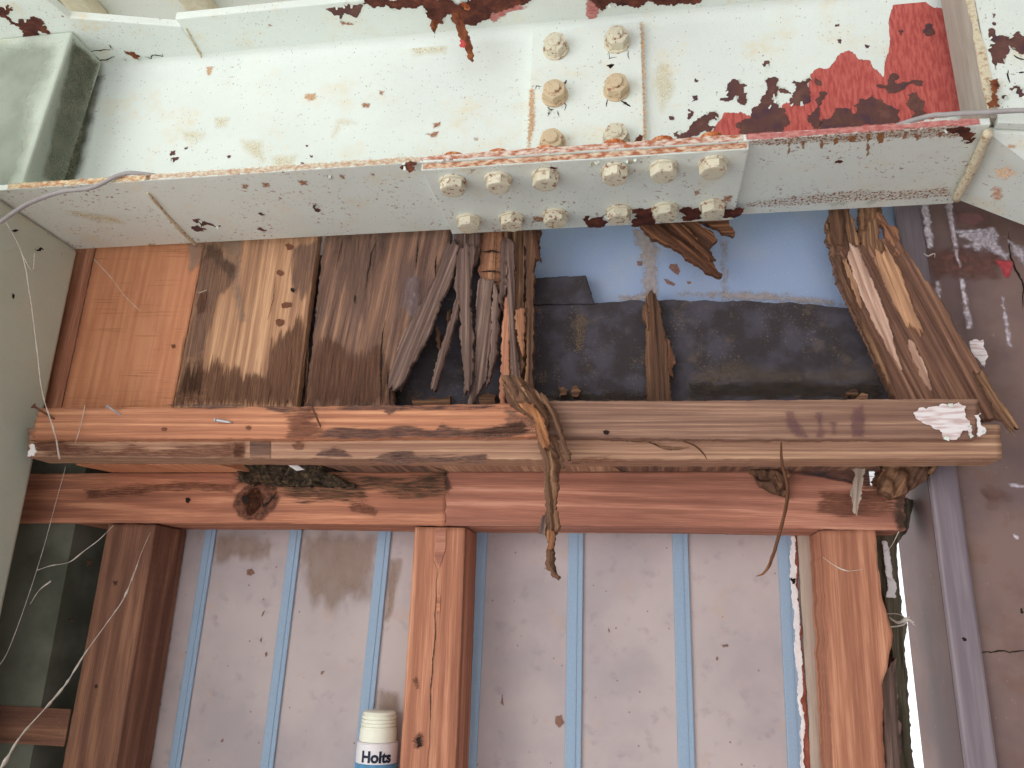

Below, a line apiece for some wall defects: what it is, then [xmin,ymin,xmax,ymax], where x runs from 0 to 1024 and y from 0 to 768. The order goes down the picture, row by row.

rust [361,0,531,62]
peeling [669,2,960,139]
rust [987,78,1002,109]
rust [8,89,980,189]
rust [582,215,609,229]
rust [631,208,656,228]
rust [679,207,702,221]
water stain [172,236,536,515]
peeling [914,402,986,441]
water stain [308,537,371,605]
crack [427,562,438,763]